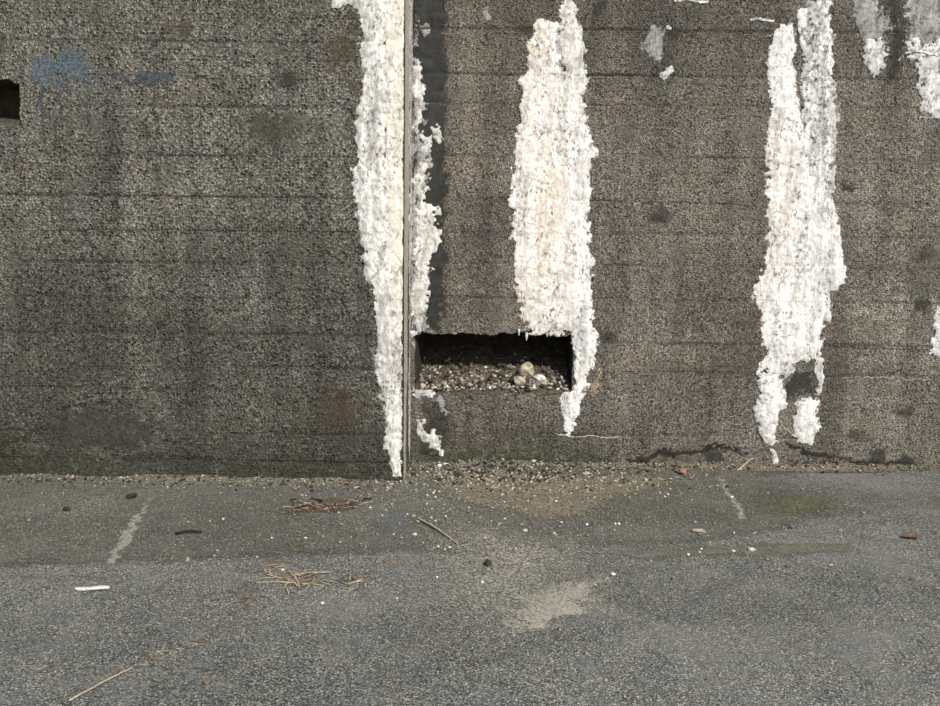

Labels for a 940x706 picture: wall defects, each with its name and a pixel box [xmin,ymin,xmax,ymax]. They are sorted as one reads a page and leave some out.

damp [331,0,450,477]
damp [505,0,618,438]
damp [750,0,847,465]
damp [853,0,940,119]
damp [928,305,940,357]